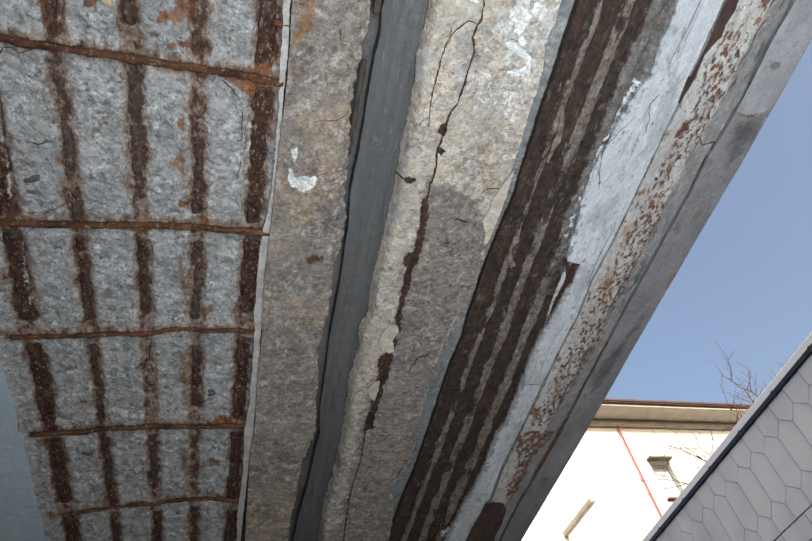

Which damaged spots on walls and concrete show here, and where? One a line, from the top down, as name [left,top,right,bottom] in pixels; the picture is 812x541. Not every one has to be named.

corrosion [157,0,194,24]
corrosion [225,52,275,100]
peeling [473,0,559,110]
corrosion [170,153,186,178]
peeling [288,147,318,193]
crack [400,0,485,303]
spalling [0,0,291,541]
corrosion [363,198,429,431]
spalling [341,171,514,541]
peeling [547,263,579,315]
corrosion [506,30,748,504]
crack [342,407,372,541]